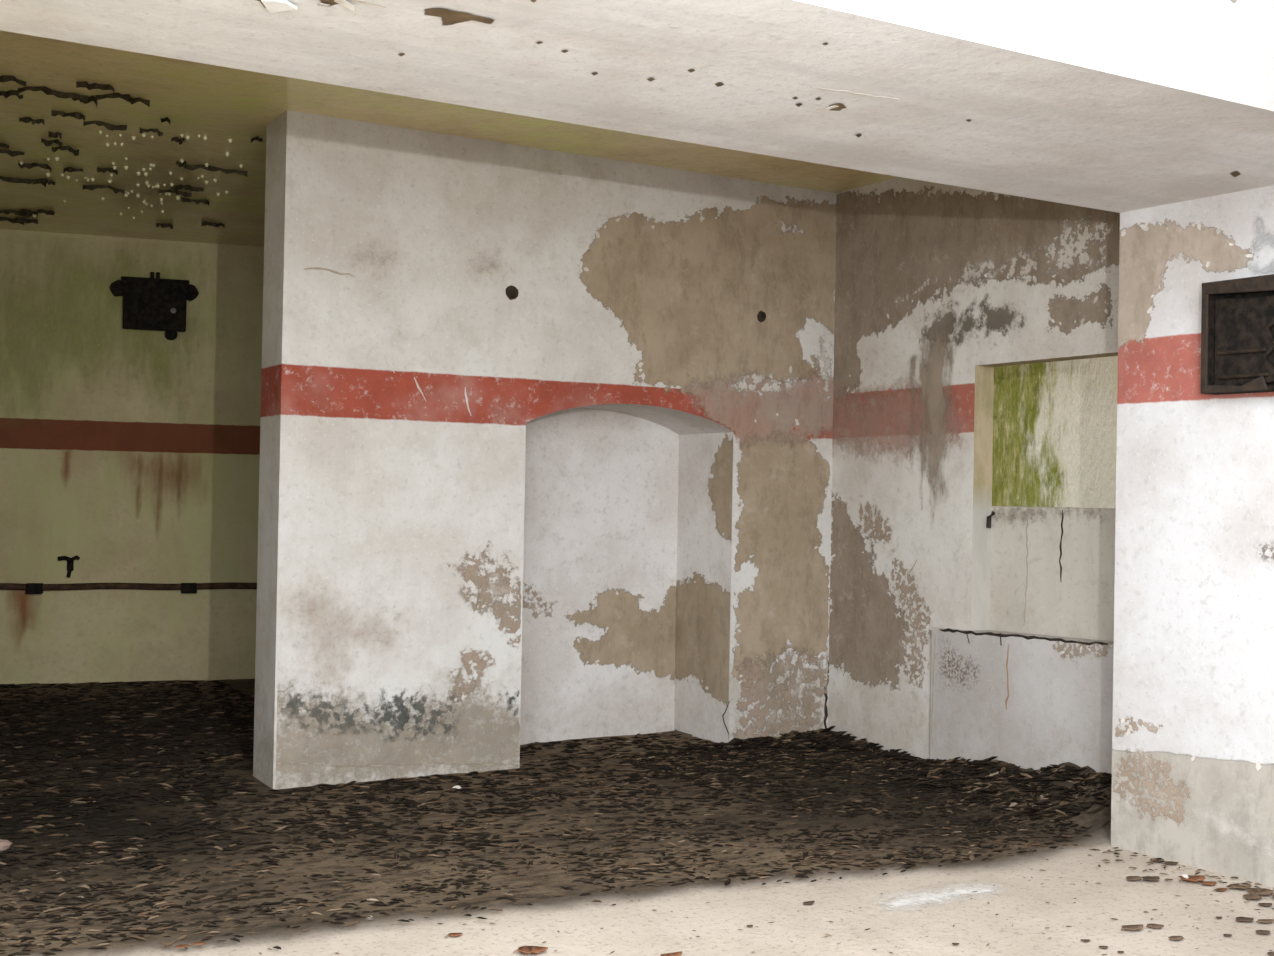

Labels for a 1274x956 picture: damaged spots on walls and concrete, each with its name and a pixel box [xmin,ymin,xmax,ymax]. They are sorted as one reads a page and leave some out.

spalling [257,0,297,13]
spalling [318,0,355,11]
spalling [424,8,494,26]
peeling [0,75,185,195]
peeling [176,161,248,177]
peeling [158,185,209,205]
peeling [0,209,55,225]
peeling [449,186,1253,740]
damp [276,688,520,788]